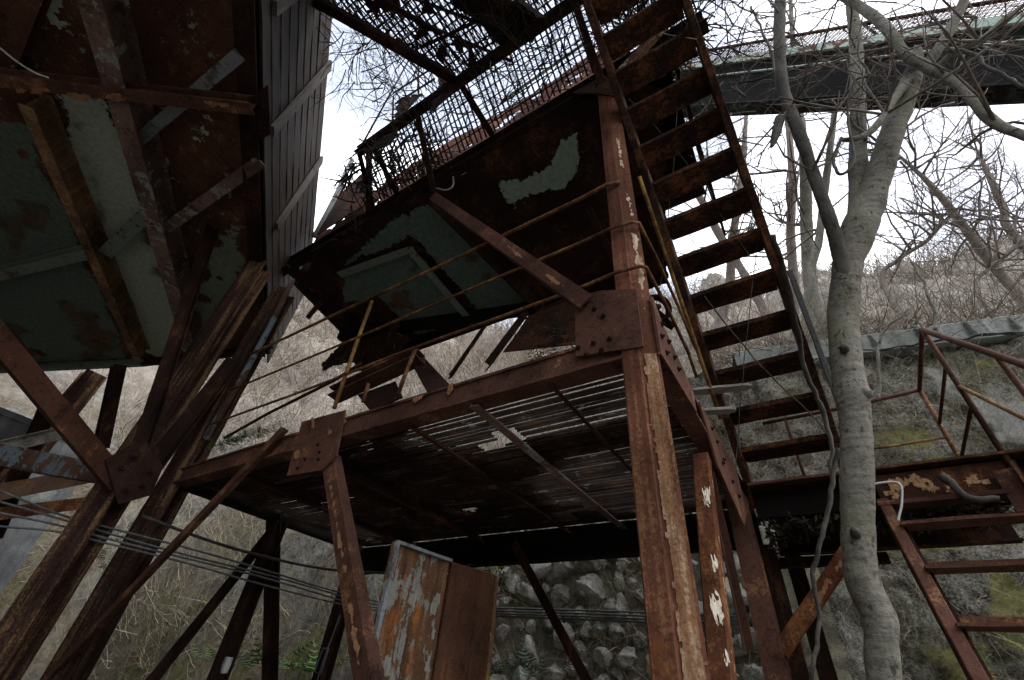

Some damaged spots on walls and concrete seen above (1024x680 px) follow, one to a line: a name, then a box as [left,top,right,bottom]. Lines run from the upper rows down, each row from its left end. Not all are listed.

peeling [499,132,579,209]
peeling [342,205,525,334]
peeling [380,653,392,677]
peeling [423,593,441,672]
peeling [709,590,724,625]